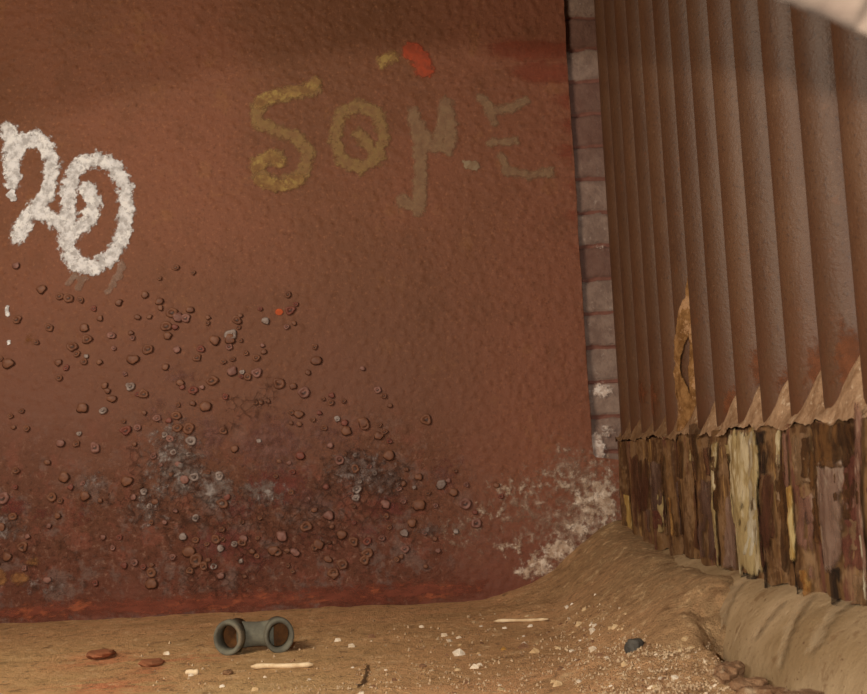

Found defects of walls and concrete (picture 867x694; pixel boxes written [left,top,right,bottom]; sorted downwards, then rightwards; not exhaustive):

leakage [497,426,620,579]